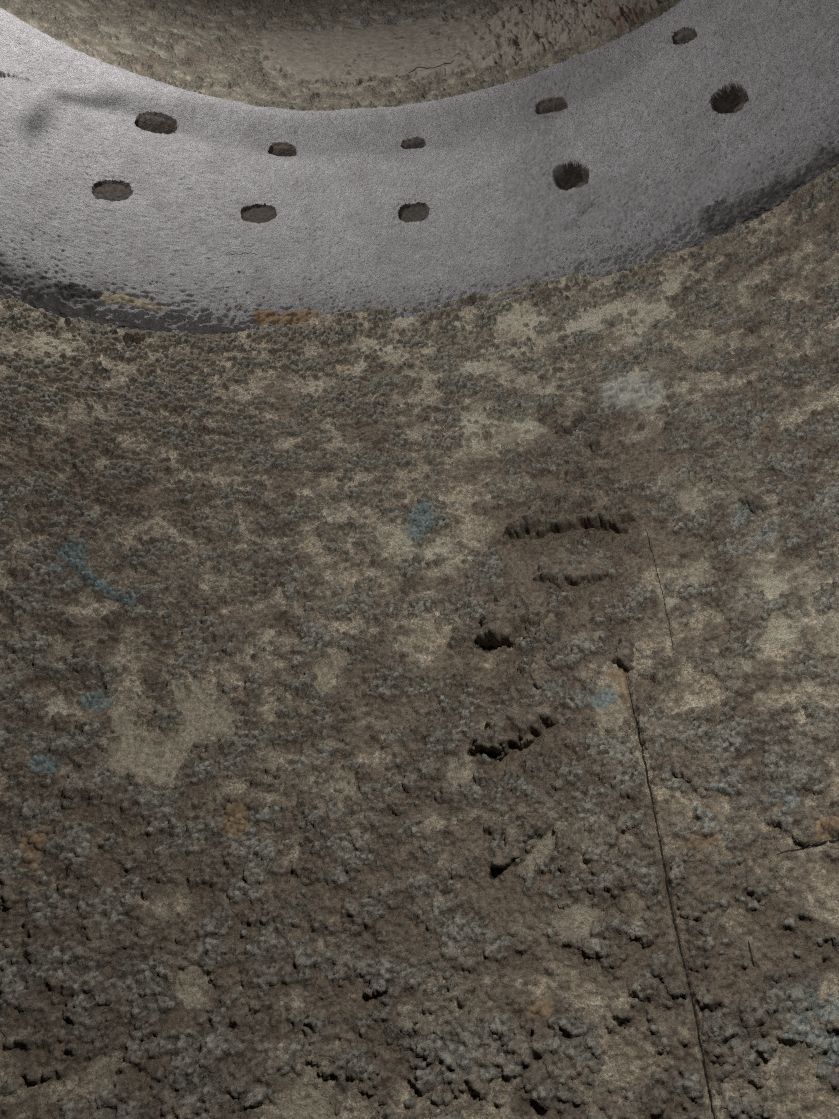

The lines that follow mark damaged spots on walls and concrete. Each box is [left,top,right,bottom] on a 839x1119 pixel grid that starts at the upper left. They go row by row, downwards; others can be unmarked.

crack [505,676,839,1119]